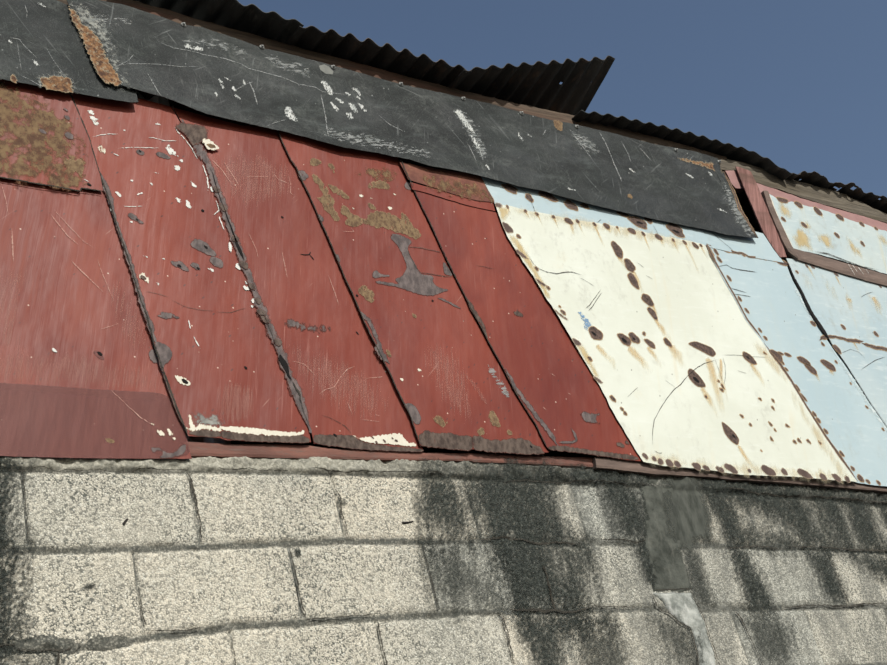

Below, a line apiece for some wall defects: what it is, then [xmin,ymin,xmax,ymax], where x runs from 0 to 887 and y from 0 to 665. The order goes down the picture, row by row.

rust [68,6,122,86]
rust [40,76,73,93]
peeling [298,158,461,309]
rust [501,184,589,225]
rust [588,326,603,340]
rust [592,211,881,485]
peeling [151,423,186,459]
peeling [186,403,638,461]
leakage [413,458,656,665]
leakage [686,551,713,605]
leakage [698,478,887,665]
leakage [659,619,703,665]